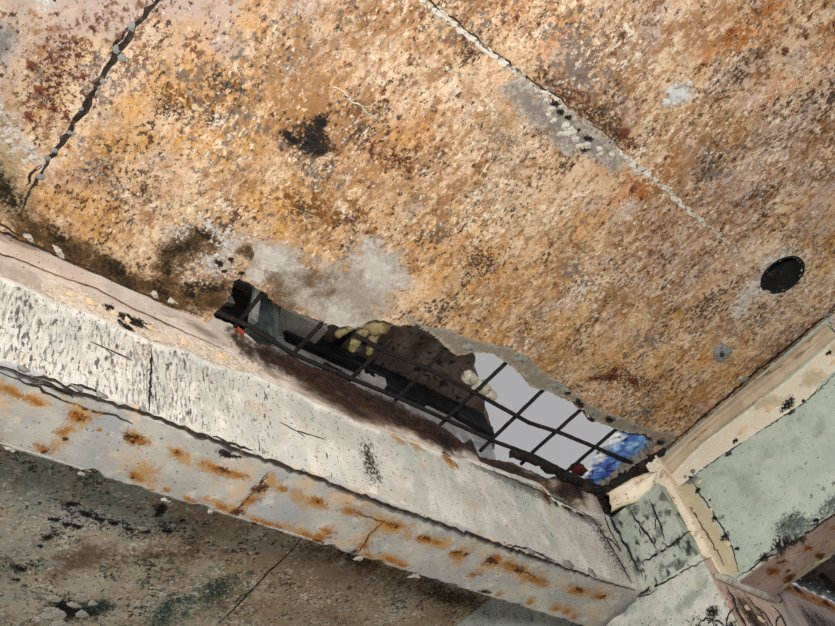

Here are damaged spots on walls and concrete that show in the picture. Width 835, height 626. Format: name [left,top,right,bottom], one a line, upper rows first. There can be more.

crack [0,0,223,349]
damp [0,116,258,315]
crack [419,0,737,254]
peeling [0,442,85,476]
rust [30,396,102,454]
rust [123,429,154,451]
rust [129,447,338,544]
crack [215,539,302,626]
crack [0,341,711,597]
rust [340,504,473,567]
spalling [214,291,674,513]
peeling [465,457,597,526]